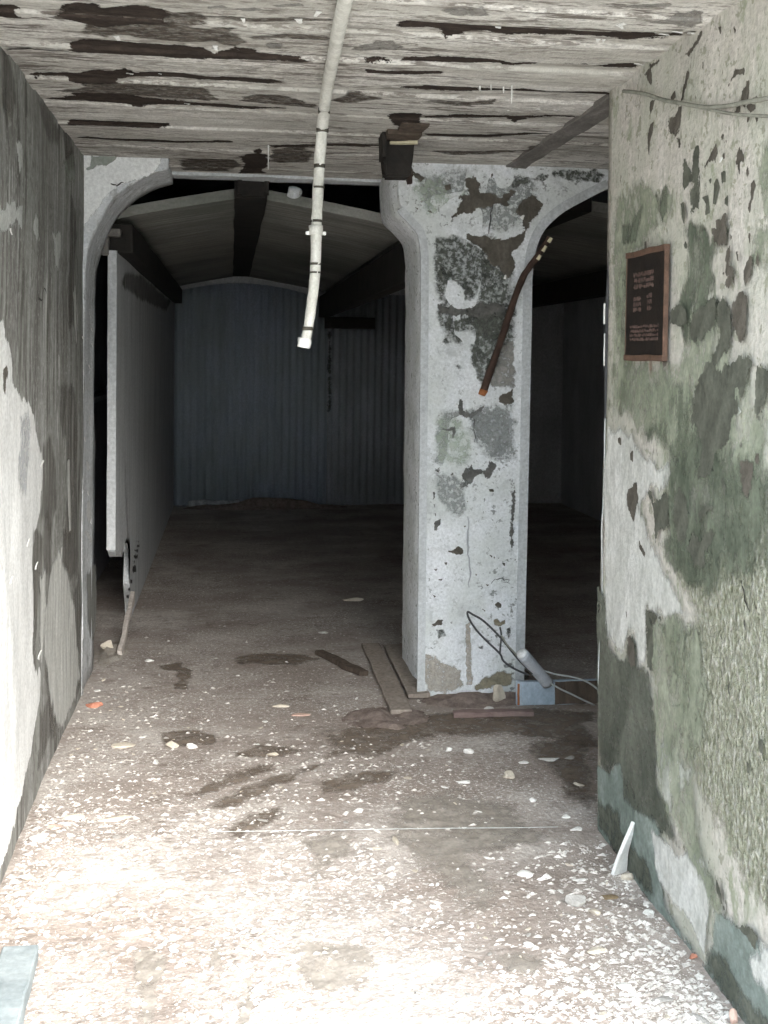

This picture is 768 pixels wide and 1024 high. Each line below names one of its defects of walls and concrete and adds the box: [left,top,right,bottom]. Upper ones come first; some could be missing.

spalling [54,3,331,62]
water stain [3,51,27,117]
spalling [29,68,316,109]
spalling [333,90,382,103]
spalling [67,119,233,143]
spalling [238,144,379,174]
water stain [68,196,78,344]
peeling [668,68,768,498]
spalling [458,399,484,418]
water stain [33,355,97,758]
water stain [322,427,768,1024]
water stain [195,745,319,808]